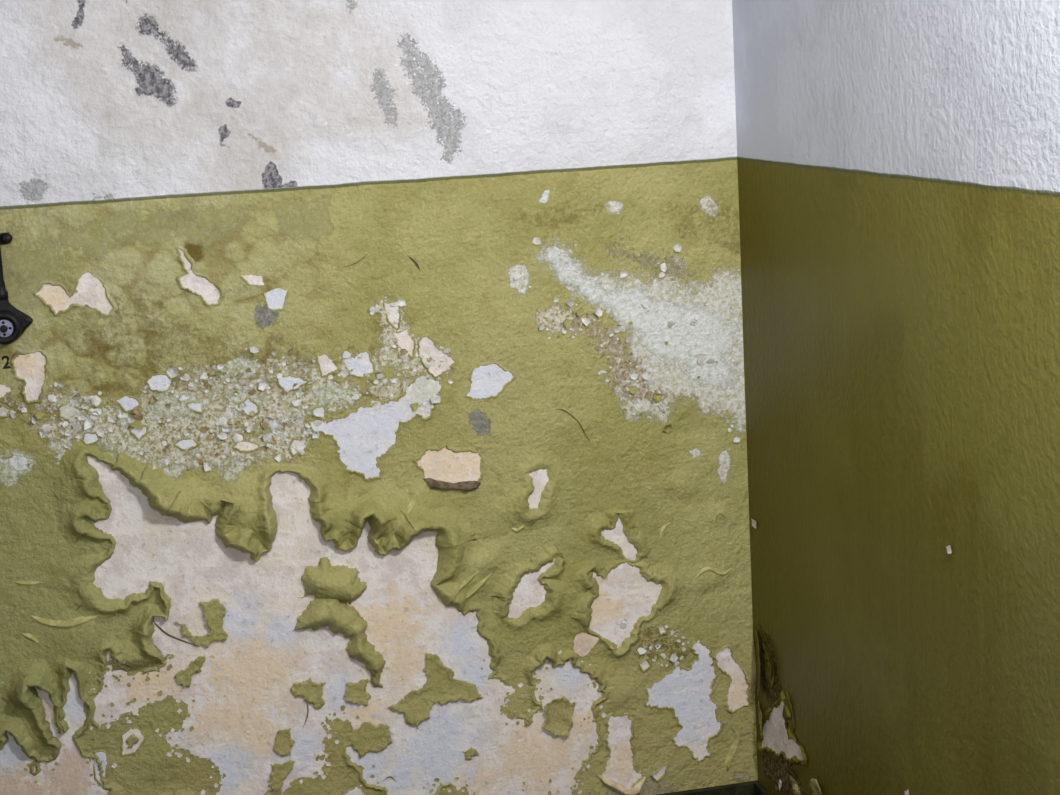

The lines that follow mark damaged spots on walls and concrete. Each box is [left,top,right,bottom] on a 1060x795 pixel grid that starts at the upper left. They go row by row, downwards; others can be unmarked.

peeling [33,269,118,318]
water stain [506,237,746,485]
peeling [0,296,822,795]